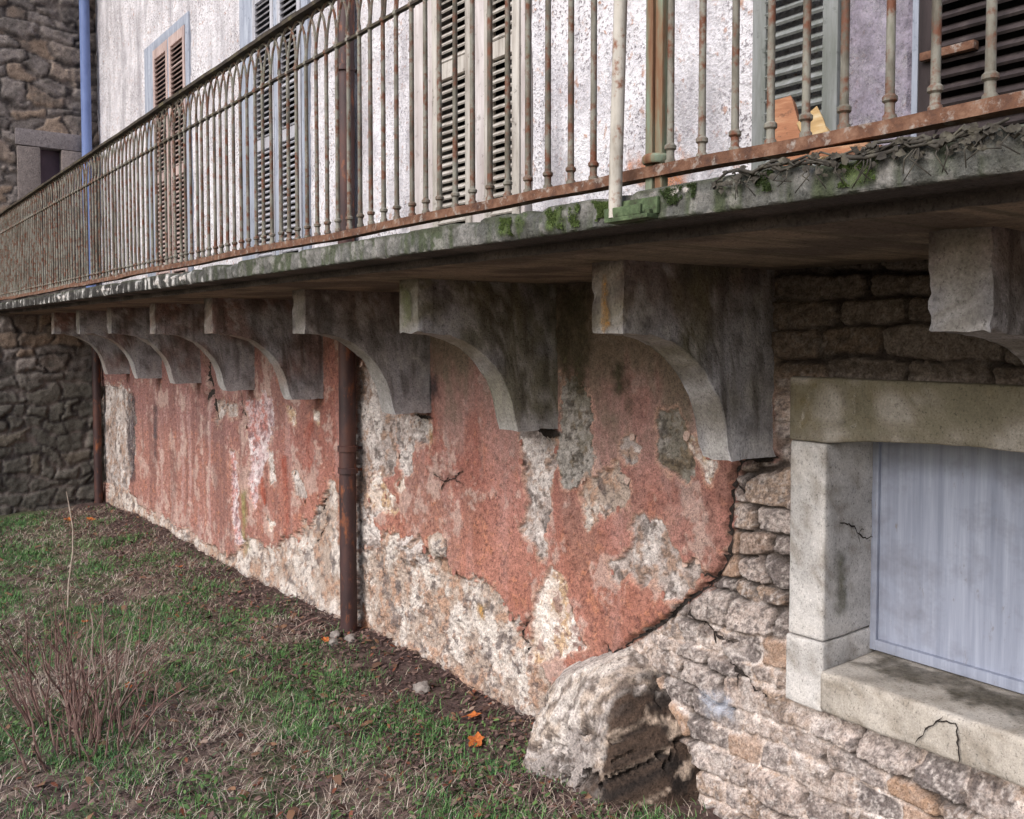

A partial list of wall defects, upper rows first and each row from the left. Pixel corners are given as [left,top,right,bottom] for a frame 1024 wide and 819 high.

corrosion [668,176,683,186]
peeling [103,384,340,619]
crack [434,471,464,489]
peeling [356,362,642,719]
peeling [610,515,704,599]
peeling [657,410,716,482]
crack [607,456,779,697]
crack [840,522,872,541]
crack [916,716,960,763]